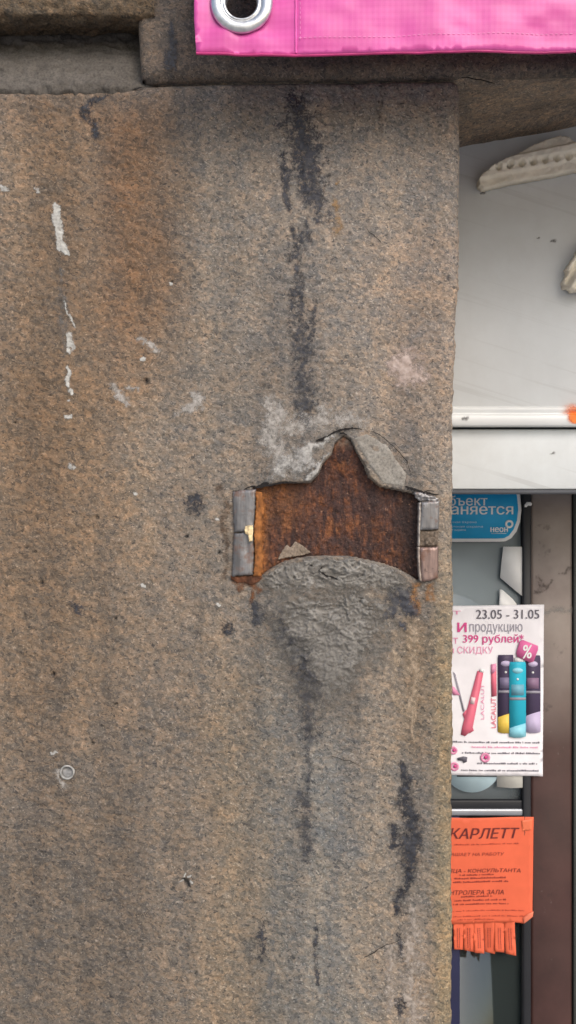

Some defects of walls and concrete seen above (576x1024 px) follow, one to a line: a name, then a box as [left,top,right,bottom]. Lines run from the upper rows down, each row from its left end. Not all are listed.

water stain [260,84,369,469]
flaking render [272,435,335,481]
crack [316,427,438,495]
water stain [389,761,423,916]